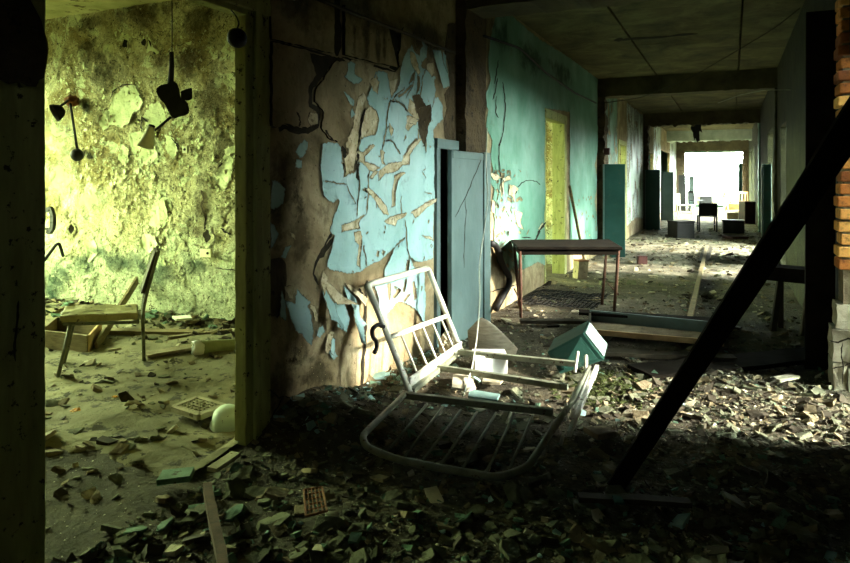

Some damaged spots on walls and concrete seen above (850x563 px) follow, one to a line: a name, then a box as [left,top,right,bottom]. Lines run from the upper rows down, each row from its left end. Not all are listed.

spalling [120,33,160,55]
crack [270,0,406,110]
peeling [99,85,178,166]
peeling [216,145,235,192]
peeling [269,22,456,360]
crack [455,60,540,257]
peeling [486,16,644,274]
hole [66,220,76,237]
peeling [83,240,98,262]
peeling [139,199,169,253]
hole [200,224,215,249]